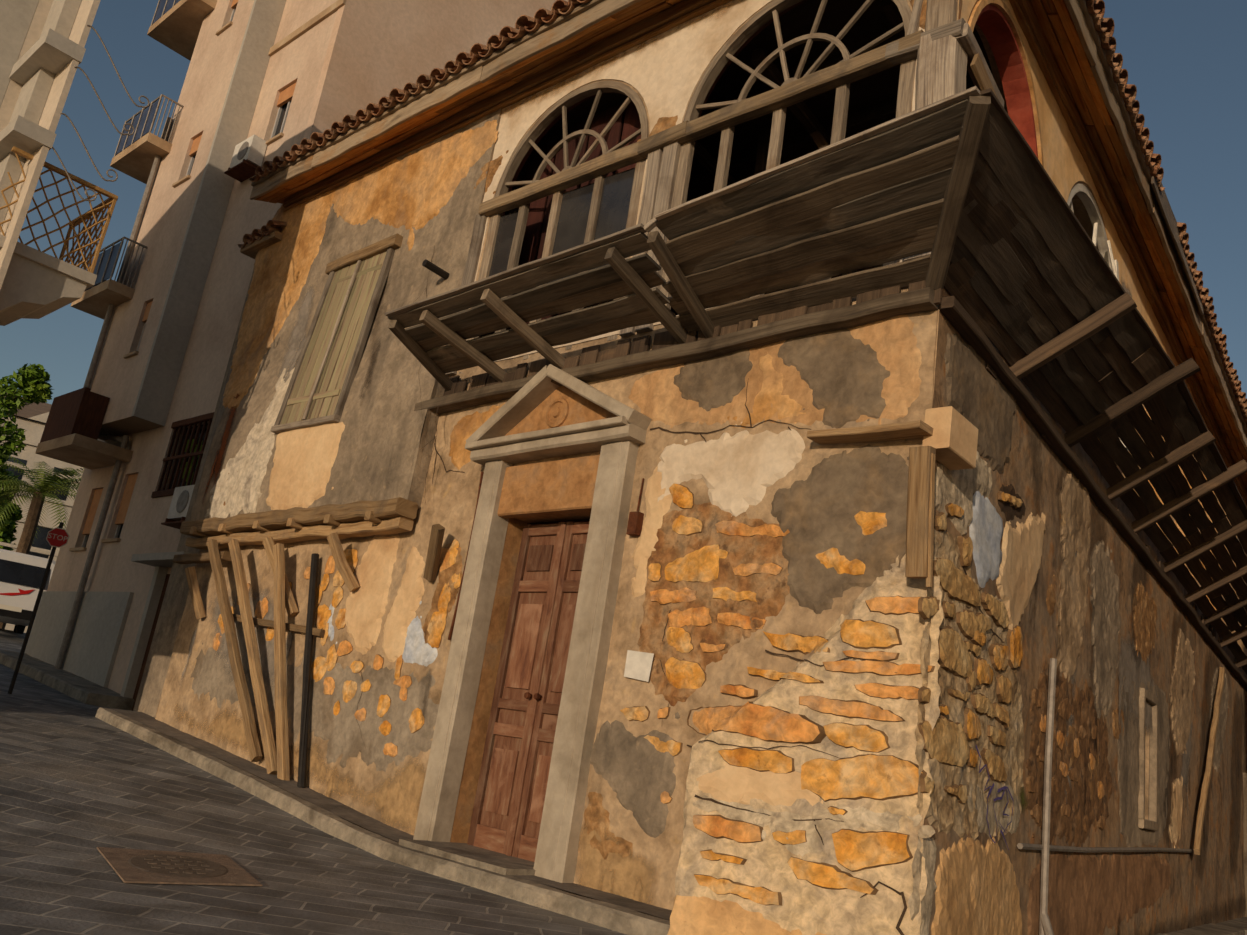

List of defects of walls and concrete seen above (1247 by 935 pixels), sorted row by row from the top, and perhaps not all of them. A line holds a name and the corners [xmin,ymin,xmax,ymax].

peeling [223,120,509,409]
peeling [204,367,345,518]
peeling [449,403,505,470]
crack [650,378,808,442]
peeling [848,314,922,425]
spalling [628,340,825,719]
spalling [202,583,274,651]
peeling [289,534,463,757]
spalling [908,333,1183,935]
peeling [696,762,823,806]
peeling [667,895,826,935]
crack [860,881,907,935]